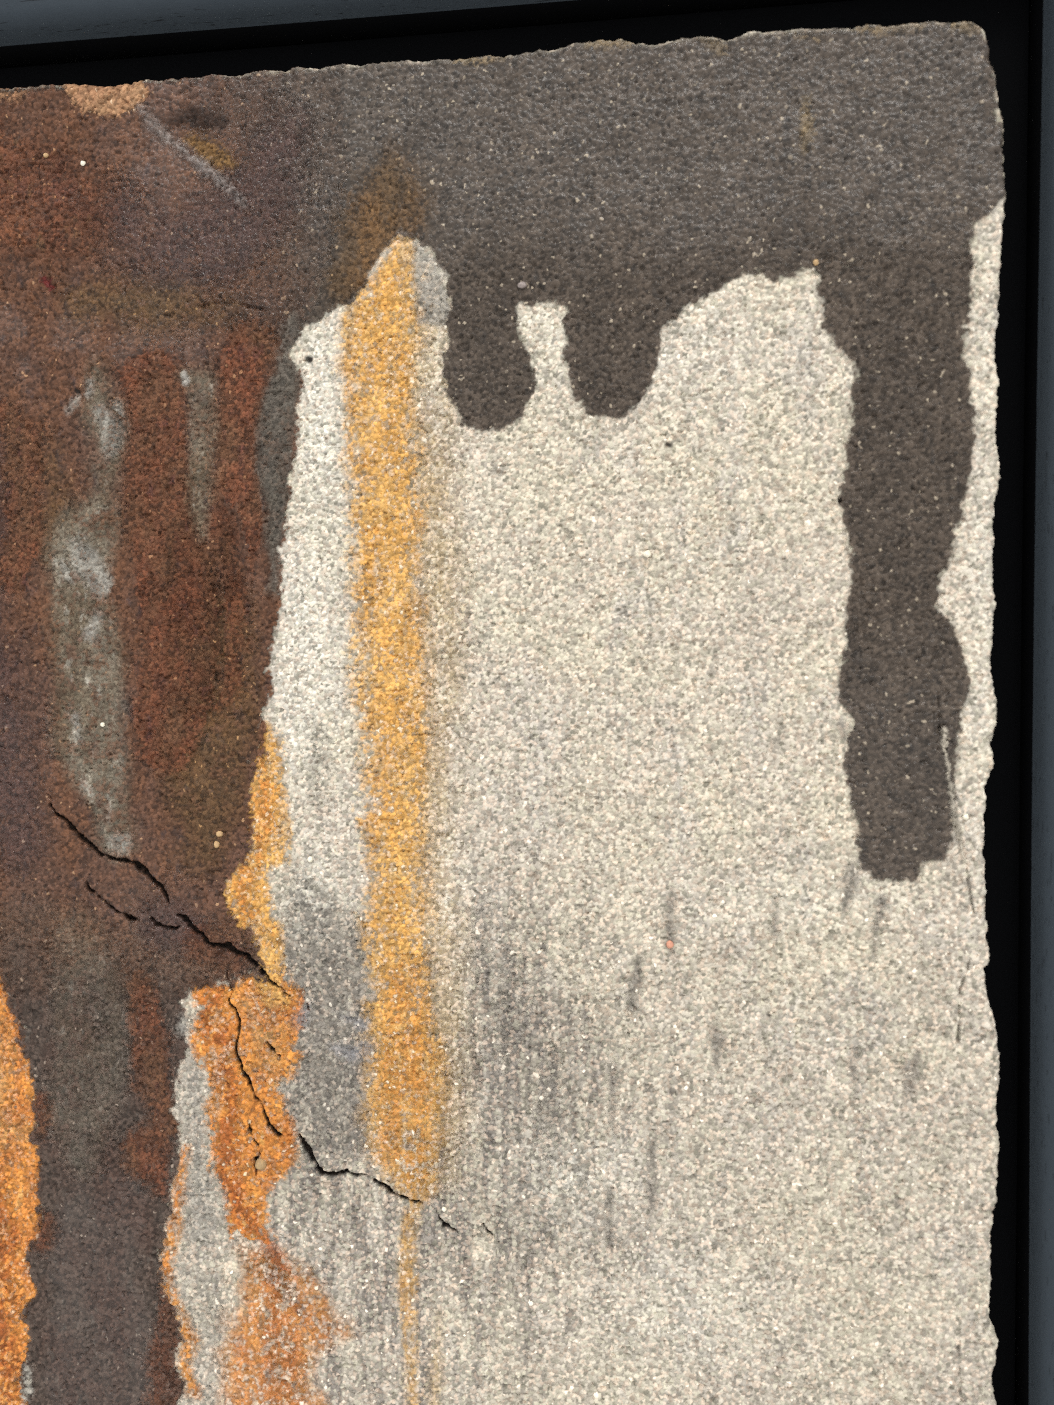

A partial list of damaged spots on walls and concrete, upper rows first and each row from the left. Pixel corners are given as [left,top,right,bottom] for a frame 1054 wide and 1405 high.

corrosion [0,74,341,1405]
water stain [181,371,206,523]
crack [50,803,492,1233]
corrosion [332,157,441,1401]
water stain [193,21,1006,941]
water stain [646,1143,656,1217]